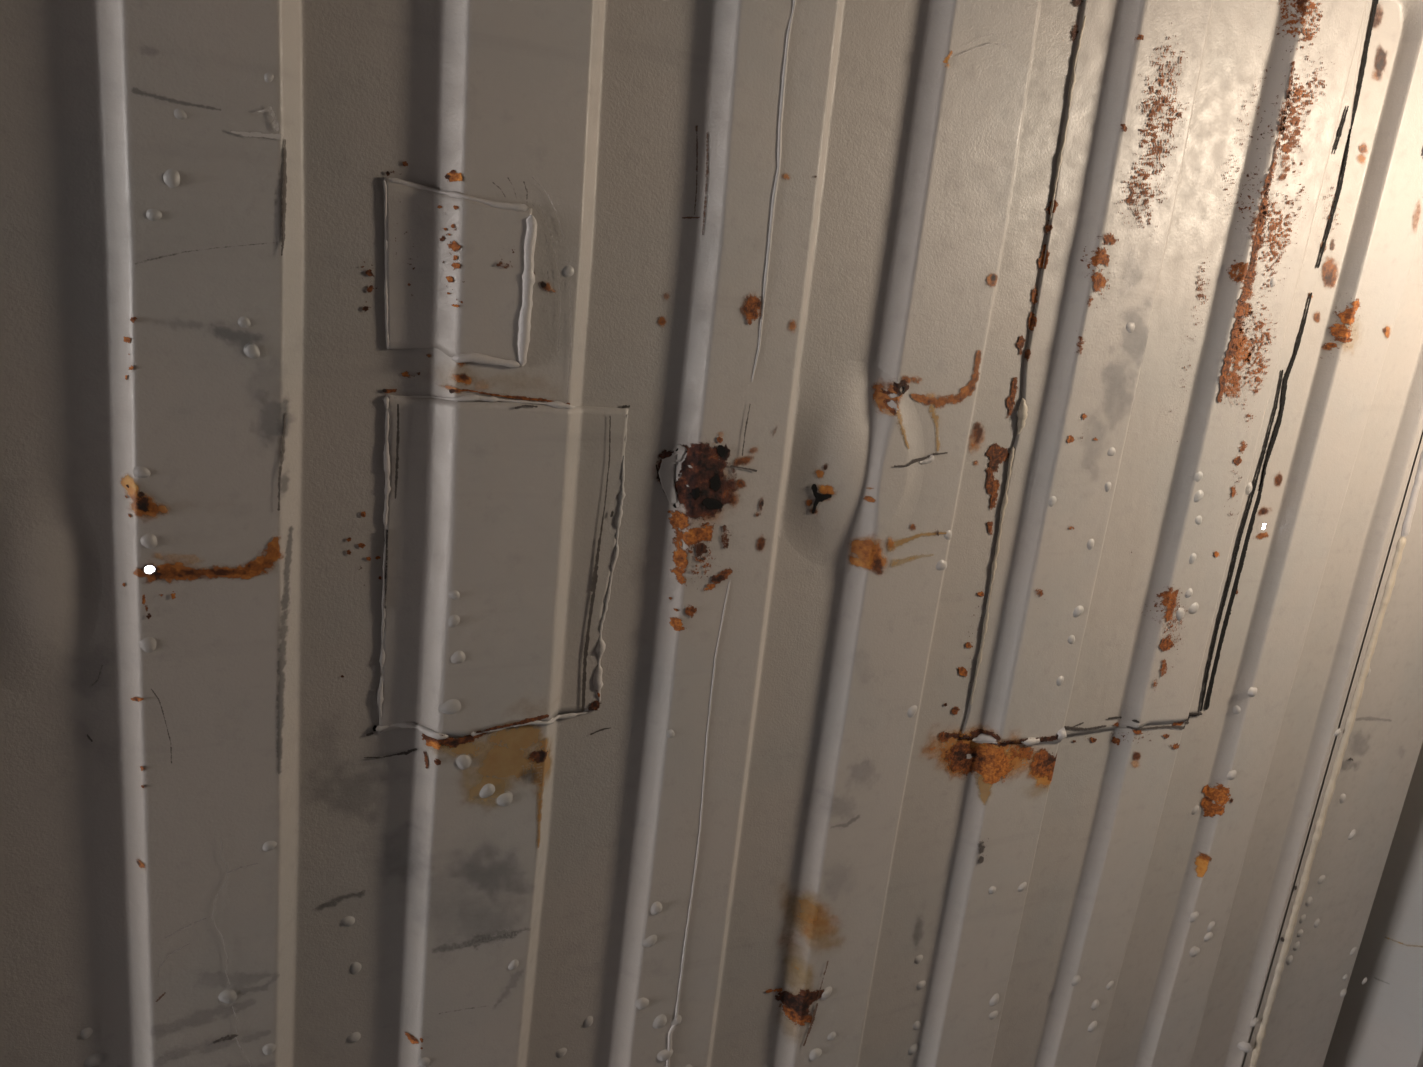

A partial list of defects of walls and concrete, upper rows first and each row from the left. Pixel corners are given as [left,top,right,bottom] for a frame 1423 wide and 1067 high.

rust [1374,48,1387,80]
rust [1081,22,1189,308]
rust [1038,199,1059,269]
rust [1180,0,1361,515]
rust [1017,286,1038,361]
rust [872,350,981,451]
crack [1064,0,1378,749]
rust [970,422,1010,535]
rust [122,537,283,619]
rust [849,524,946,574]
rust [927,729,1058,805]
rust [766,959,828,1046]